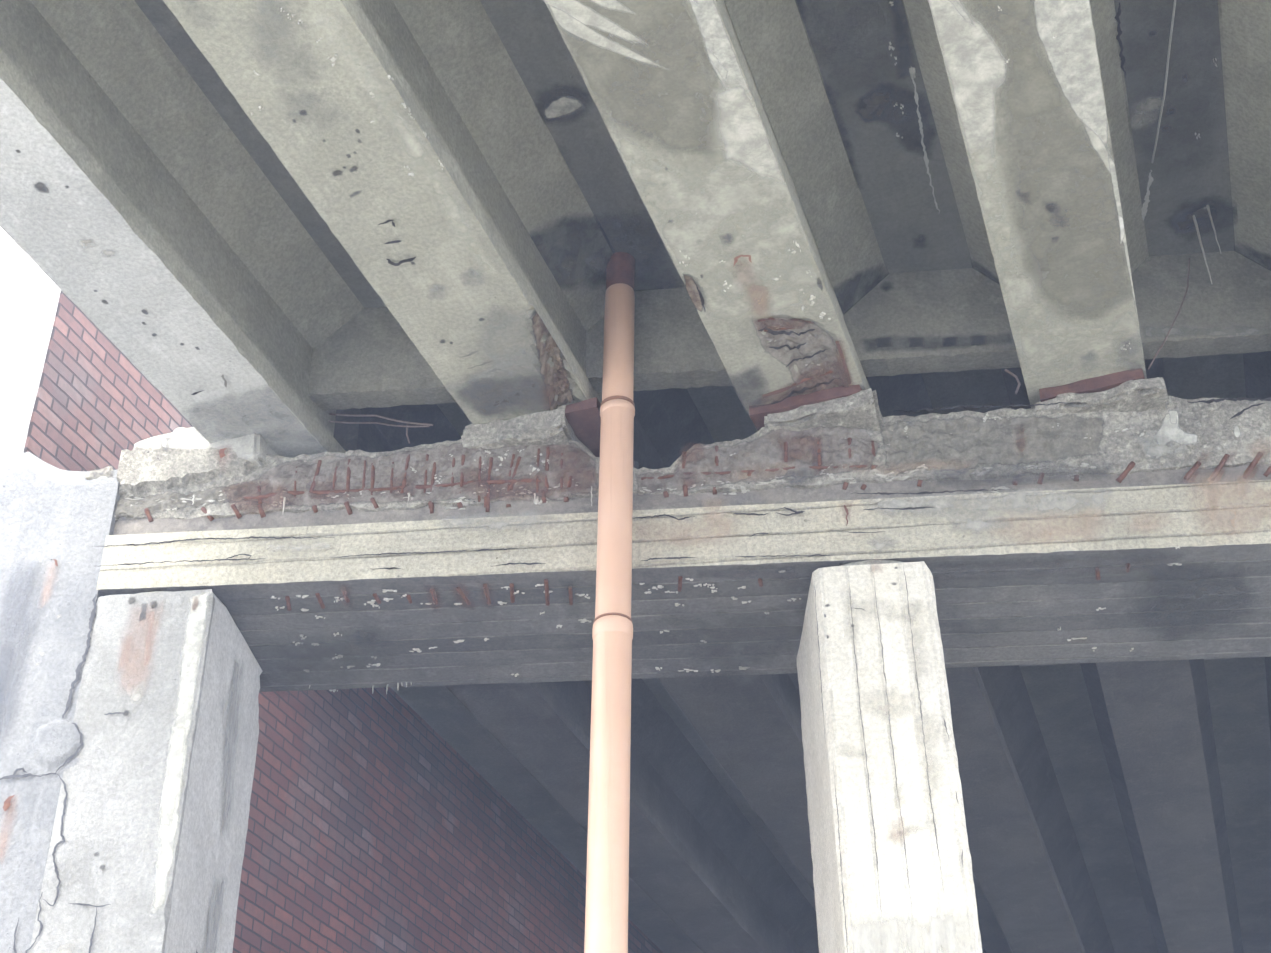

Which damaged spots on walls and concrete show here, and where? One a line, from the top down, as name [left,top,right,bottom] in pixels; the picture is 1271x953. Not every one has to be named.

water stain [822,82,857,179]
water stain [858,0,940,212]
water stain [1084,124,1139,323]
water stain [1141,170,1154,220]
spalling [532,312,574,411]
spalling [753,317,852,406]
spalling [85,466,113,480]
spalling [115,443,597,522]
spalling [637,414,1104,498]
spalling [1116,461,1135,483]
crack [640,555,696,563]
crack [0,536,546,953]